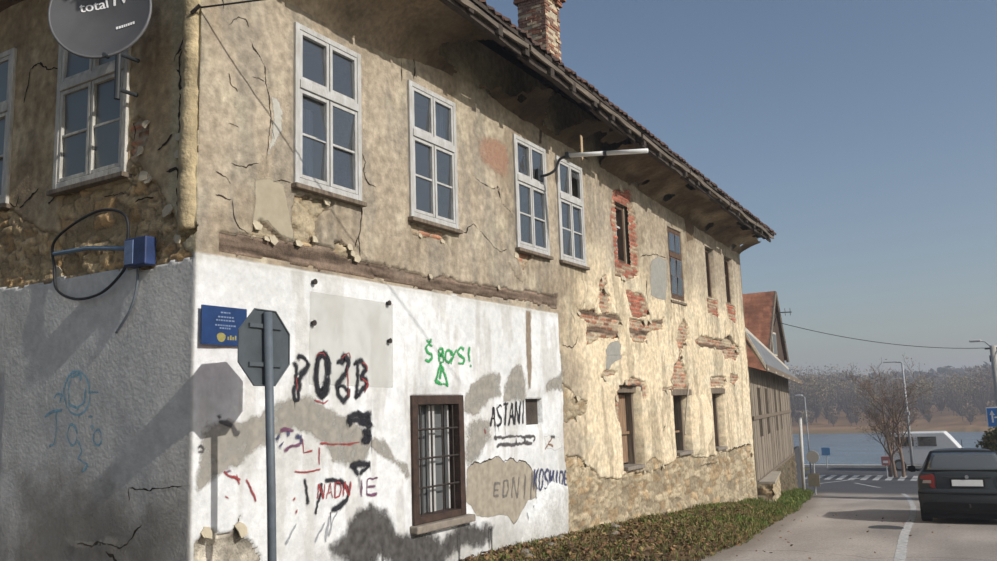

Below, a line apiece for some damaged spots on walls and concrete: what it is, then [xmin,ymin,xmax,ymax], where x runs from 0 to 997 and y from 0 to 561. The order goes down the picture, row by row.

crack [24,62,58,101]
crack [216,0,288,234]
flaking render [0,118,197,288]
peeling [252,179,331,248]
flaking render [334,242,361,263]
flaking render [577,185,663,345]
flaking render [662,299,740,394]
crack [128,486,182,500]
crack [78,526,141,561]
flaking render [193,518,260,561]